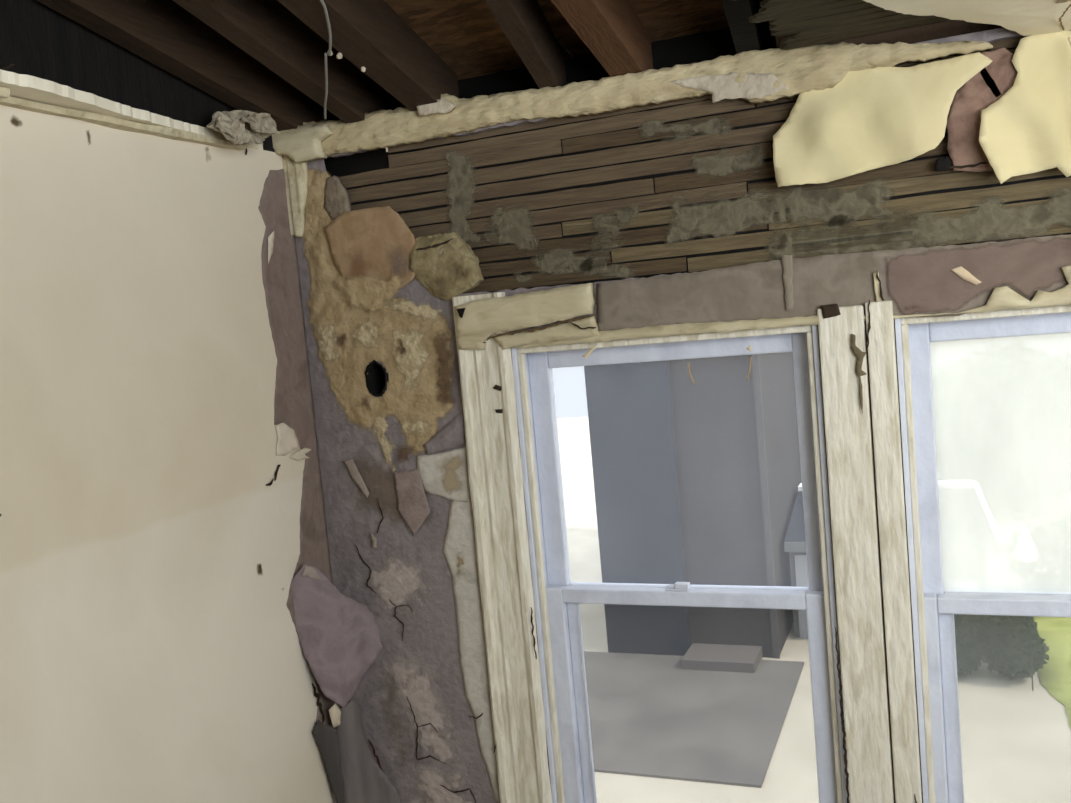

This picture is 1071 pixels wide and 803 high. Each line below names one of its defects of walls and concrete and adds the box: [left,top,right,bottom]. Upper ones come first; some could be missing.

flaking render [324,36,1071,331]
peeling [258,169,333,637]
flaking render [344,459,369,498]
flaking render [395,469,430,536]
flaking render [423,412,466,455]
crack [355,498,413,641]
peeling [315,678,342,729]
crack [368,739,385,774]
crack [407,697,476,803]
crack [835,628,849,803]